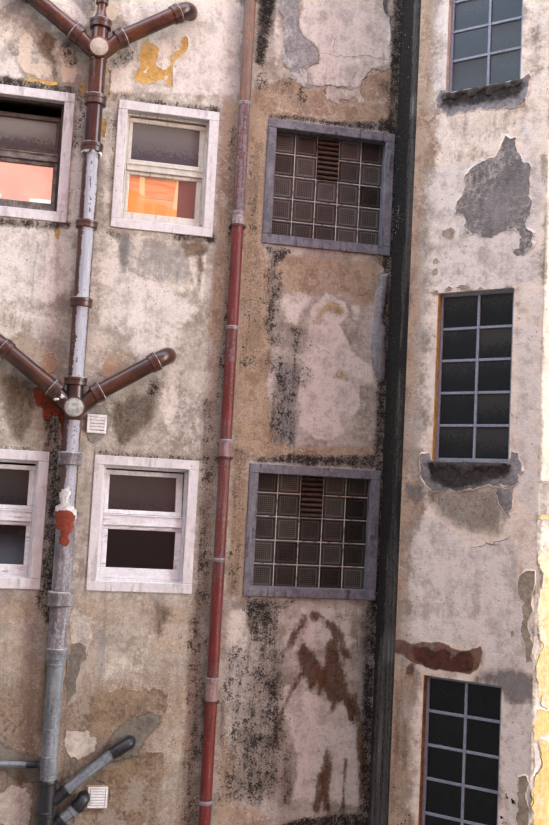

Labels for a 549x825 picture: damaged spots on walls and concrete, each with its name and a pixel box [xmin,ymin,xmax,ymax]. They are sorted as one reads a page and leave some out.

peeling [133,35,191,89]
spalling [277,0,366,105]
spalling [442,134,536,257]
spalling [418,451,524,518]
peeling [504,545,549,825]
peeling [0,784,33,825]